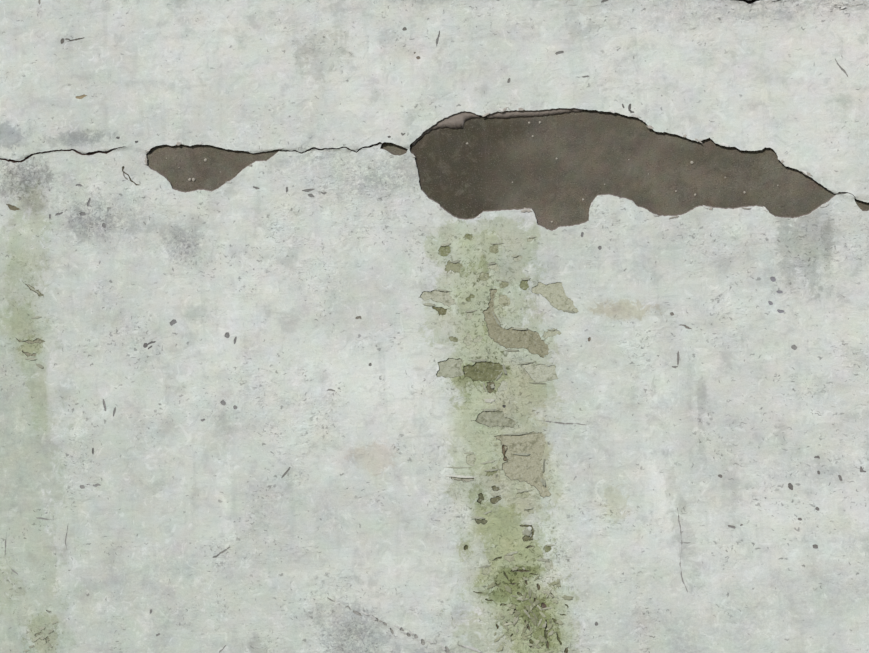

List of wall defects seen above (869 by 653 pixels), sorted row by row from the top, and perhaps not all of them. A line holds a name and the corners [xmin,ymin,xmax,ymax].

crack [736,0,781,8]
crack [0,146,139,185]
spalling [135,141,283,193]
crack [280,142,382,154]
spalling [380,104,838,237]
damp [450,222,511,252]
damp [444,274,516,319]
peeling [449,243,579,384]
peeling [436,358,551,525]
damp [456,375,563,590]
damp [290,576,529,653]
spalling [473,525,574,653]